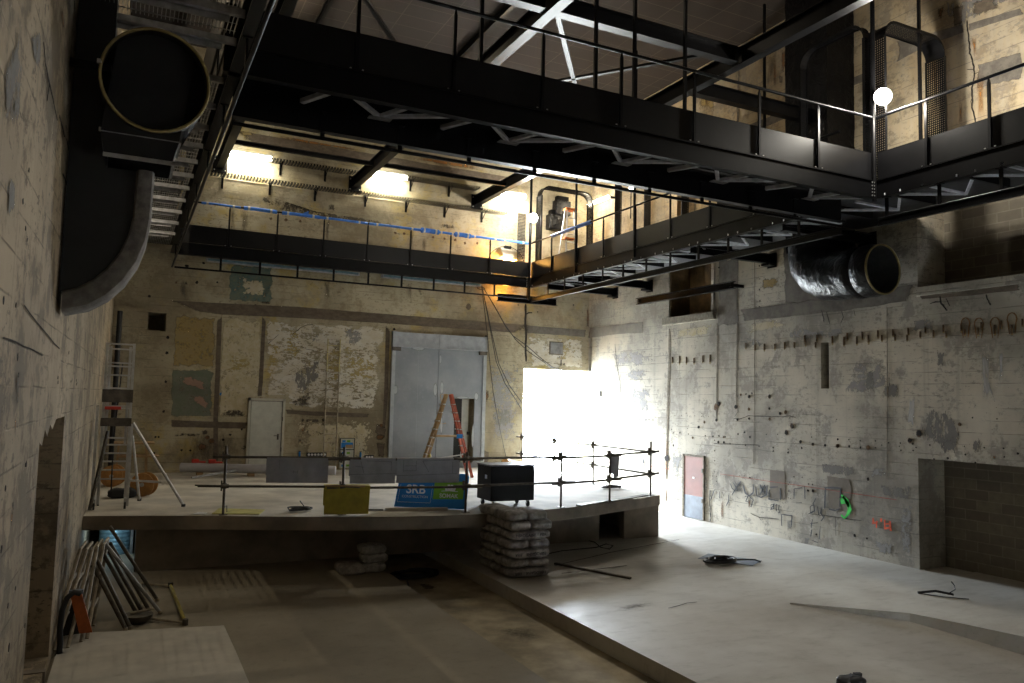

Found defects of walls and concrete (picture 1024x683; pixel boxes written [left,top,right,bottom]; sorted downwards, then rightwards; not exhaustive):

crack [966,20,978,122]
peeling [171,317,386,458]
peeling [908,409,981,453]